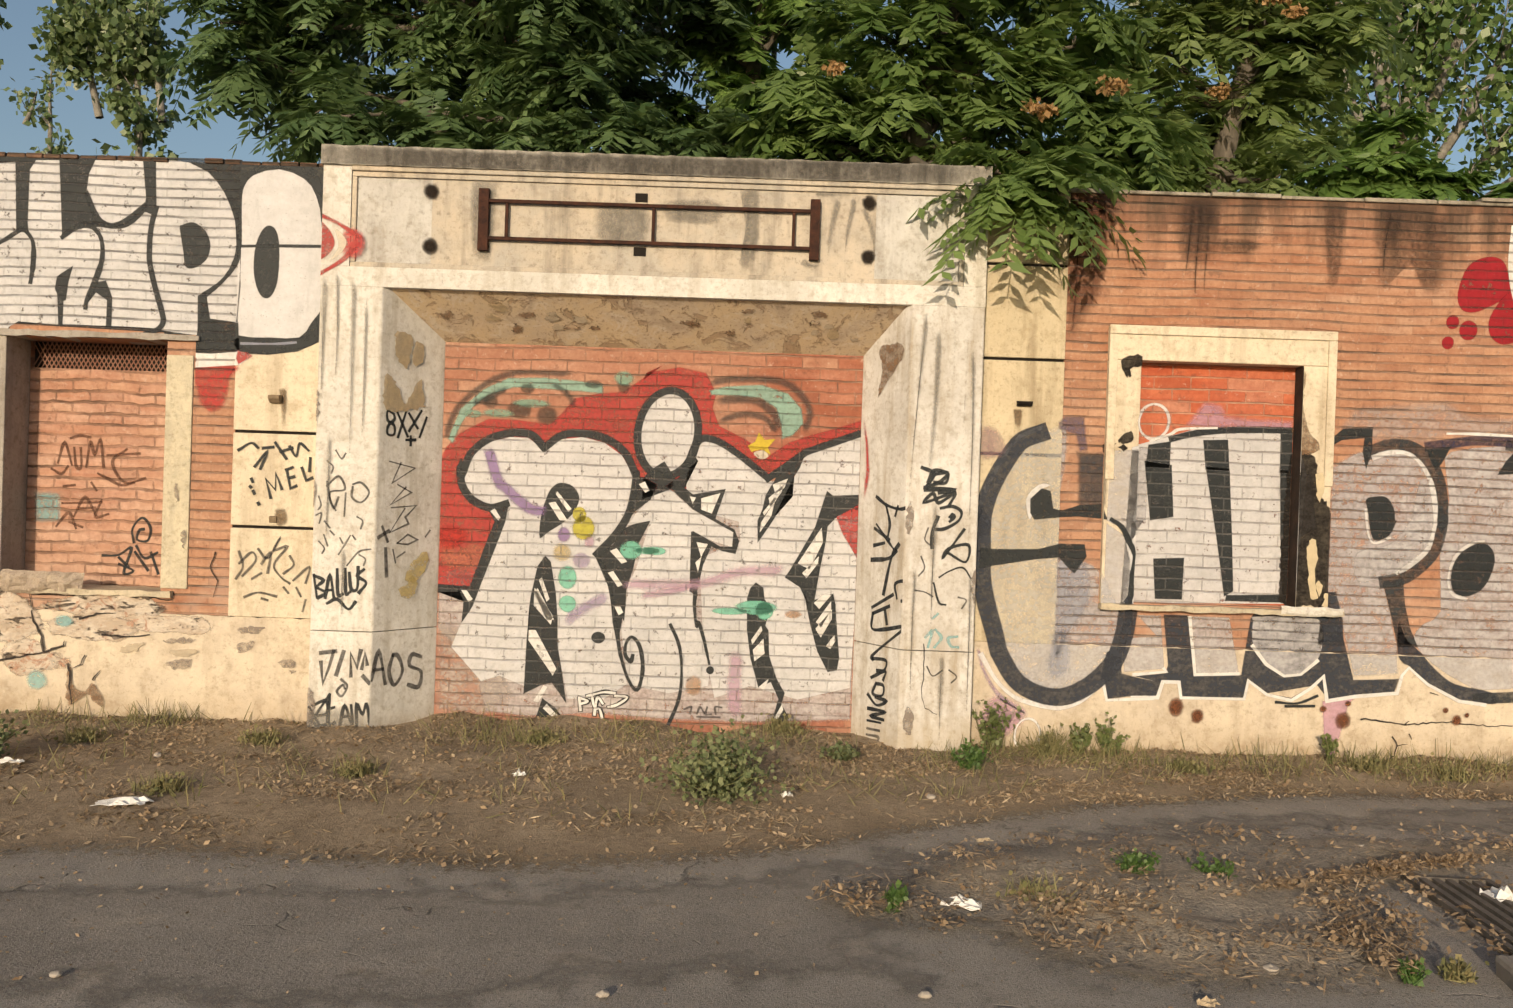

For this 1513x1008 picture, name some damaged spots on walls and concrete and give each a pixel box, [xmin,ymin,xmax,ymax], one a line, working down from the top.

spalling [0,587,210,706]